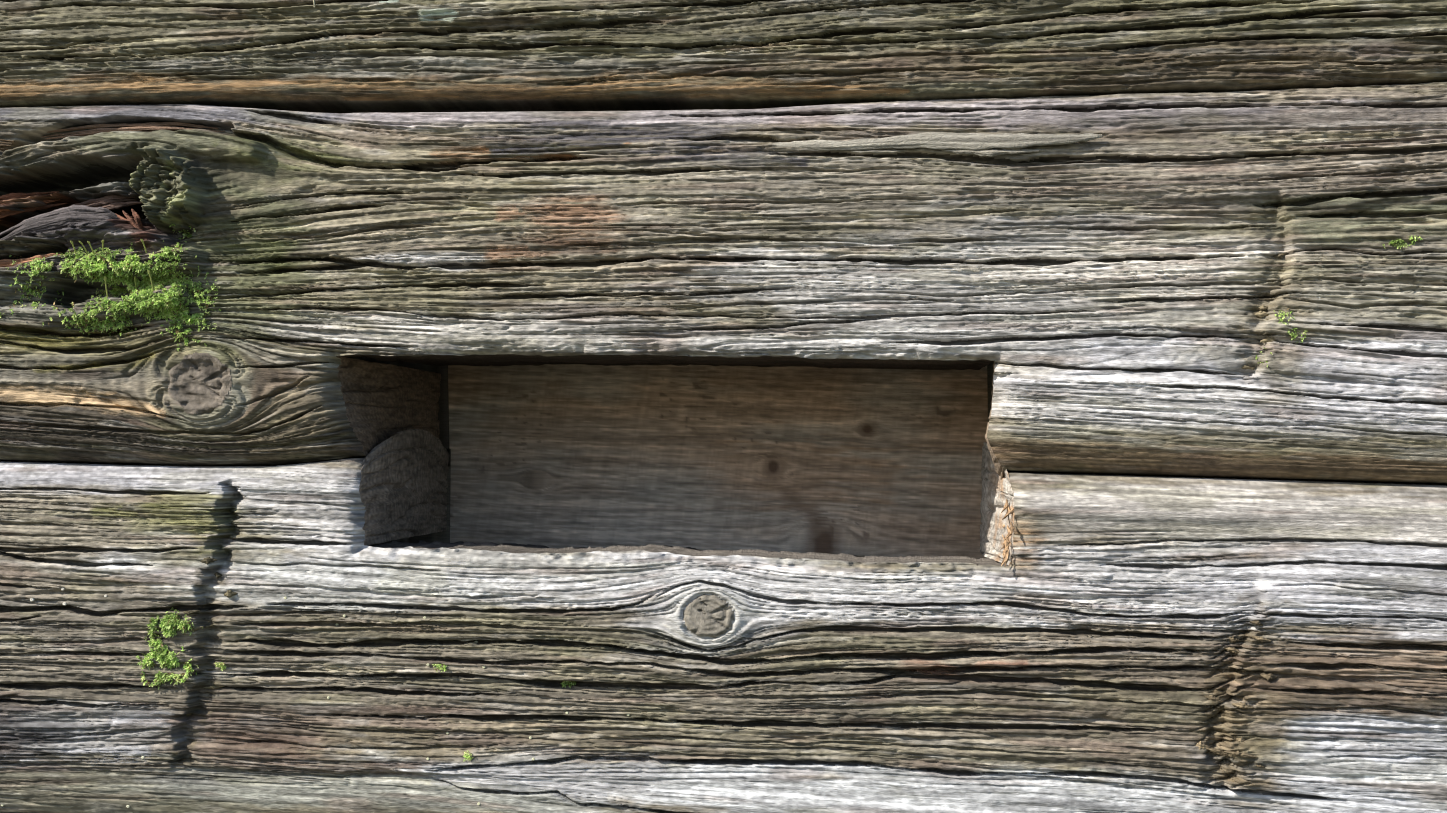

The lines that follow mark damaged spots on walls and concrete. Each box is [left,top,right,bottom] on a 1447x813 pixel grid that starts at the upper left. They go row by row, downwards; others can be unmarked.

crack [232,538,347,546]
crack [0,546,1447,813]